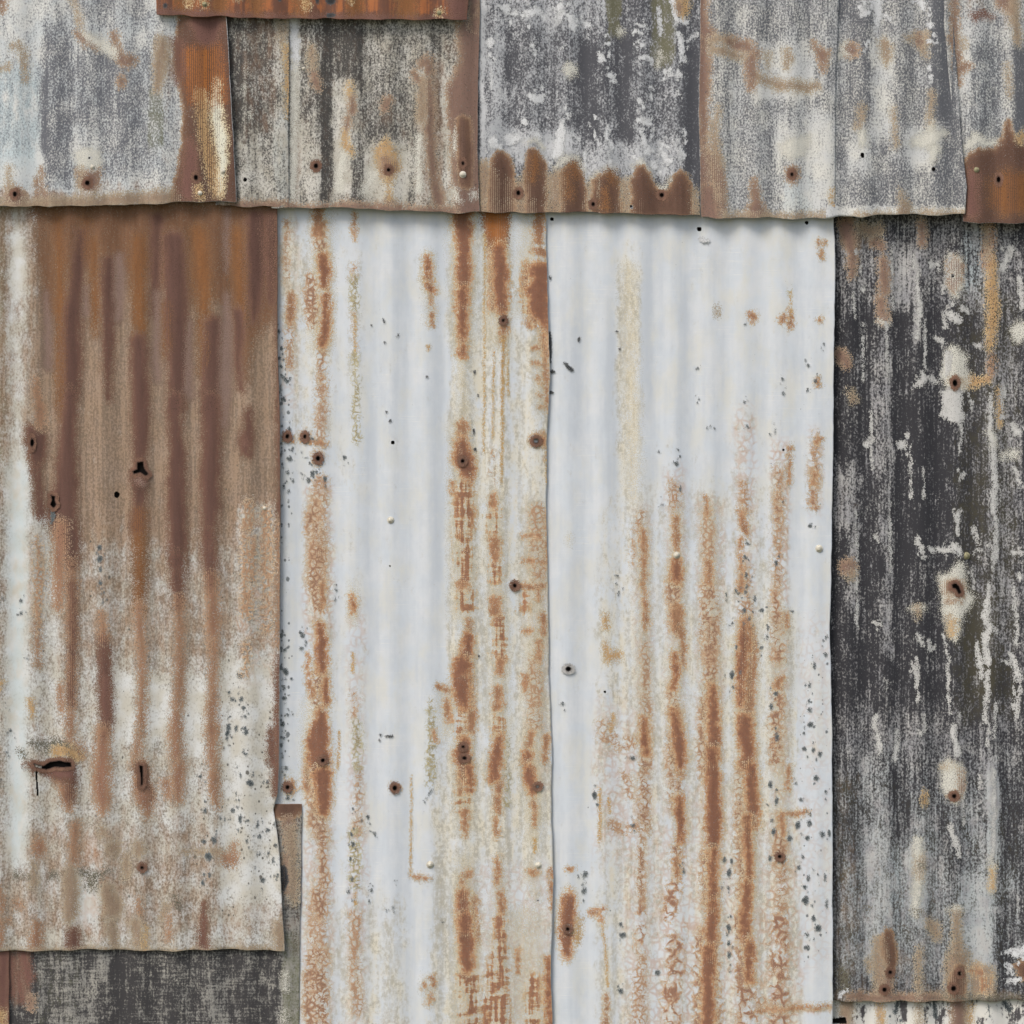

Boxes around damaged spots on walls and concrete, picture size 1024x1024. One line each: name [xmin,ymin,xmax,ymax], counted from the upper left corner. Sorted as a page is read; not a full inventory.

corrosion [833,118,1024,430]
peeling [910,252,970,391]
peeling [998,244,1024,345]
corrosion [0,0,826,854]
peeling [998,421,1024,489]
peeling [914,508,997,590]
corrosion [263,469,342,1024]
corrosion [594,428,1024,1024]
peeling [915,633,937,653]
corrosion [0,816,285,1024]
corrosion [445,849,615,1024]
peeling [1001,948,1024,986]